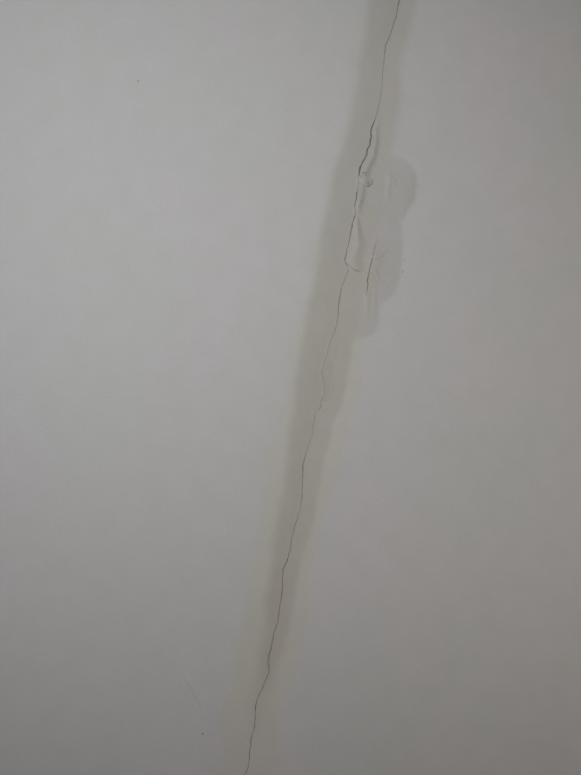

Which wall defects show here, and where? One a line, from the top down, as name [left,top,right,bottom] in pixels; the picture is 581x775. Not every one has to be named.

crack [244,0,400,775]